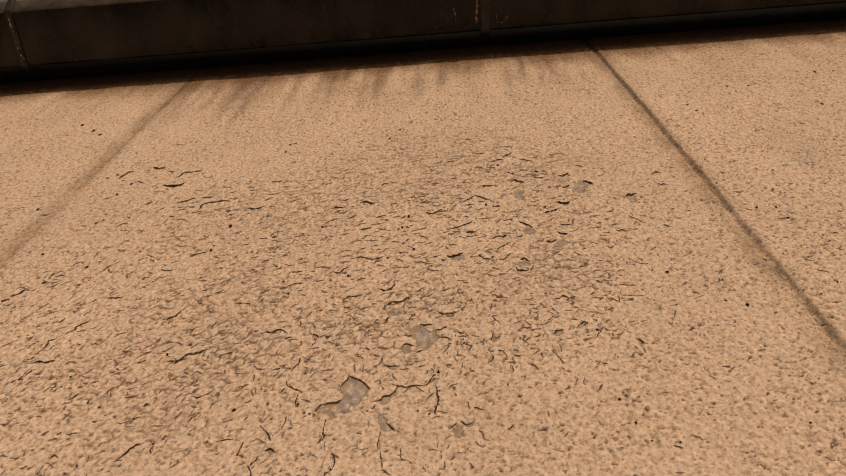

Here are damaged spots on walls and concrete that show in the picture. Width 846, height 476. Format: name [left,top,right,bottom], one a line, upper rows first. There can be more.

crack [804,210,846,272]
crack [0,130,692,476]
crack [670,256,728,317]
peeling [394,318,458,353]
peeling [309,371,402,452]